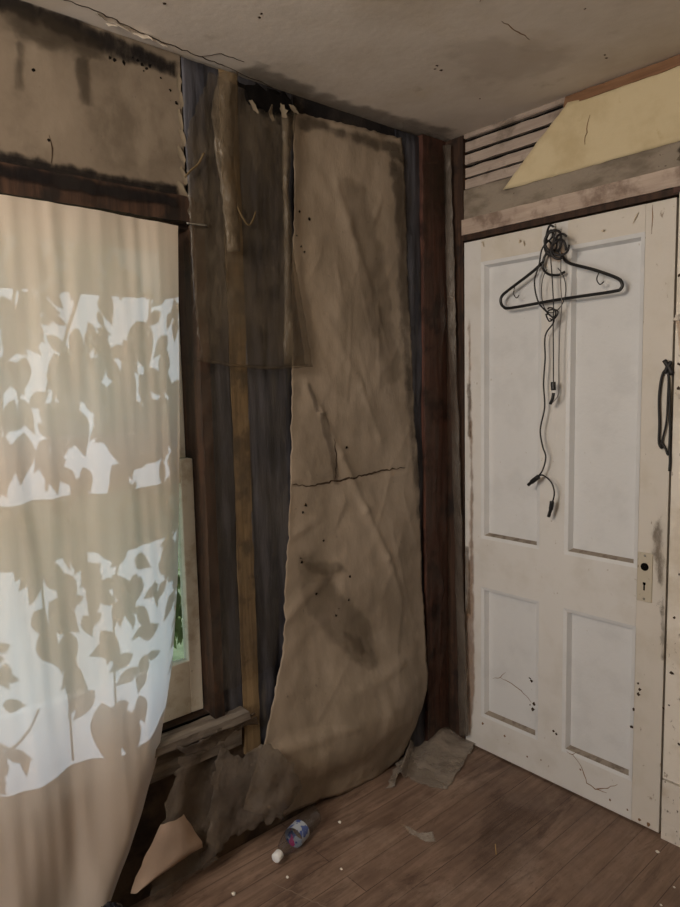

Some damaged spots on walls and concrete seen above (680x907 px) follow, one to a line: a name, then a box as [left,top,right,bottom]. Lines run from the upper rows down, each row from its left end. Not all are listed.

crack [64,0,278,90]
peeling [249,100,299,121]
damp [0,164,178,207]
crack [293,439,402,487]